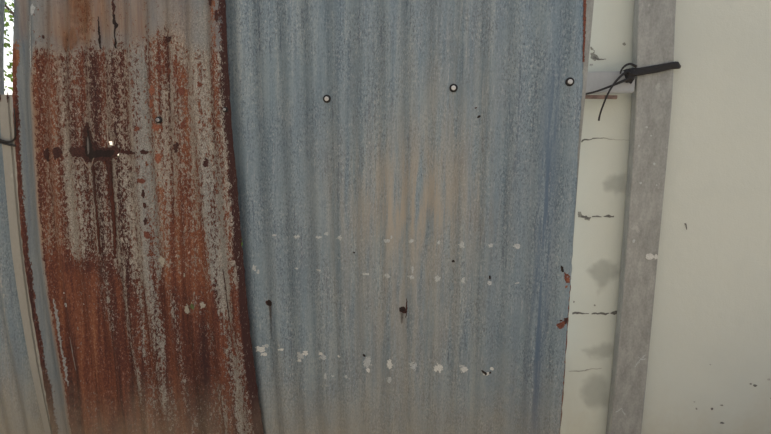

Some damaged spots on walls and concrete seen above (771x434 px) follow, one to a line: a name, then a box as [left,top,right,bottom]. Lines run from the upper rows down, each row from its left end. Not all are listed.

rust [91,162,101,255]
rust [105,160,117,259]
rust [137,178,150,239]
crack [578,212,614,220]
crack [572,301,617,315]